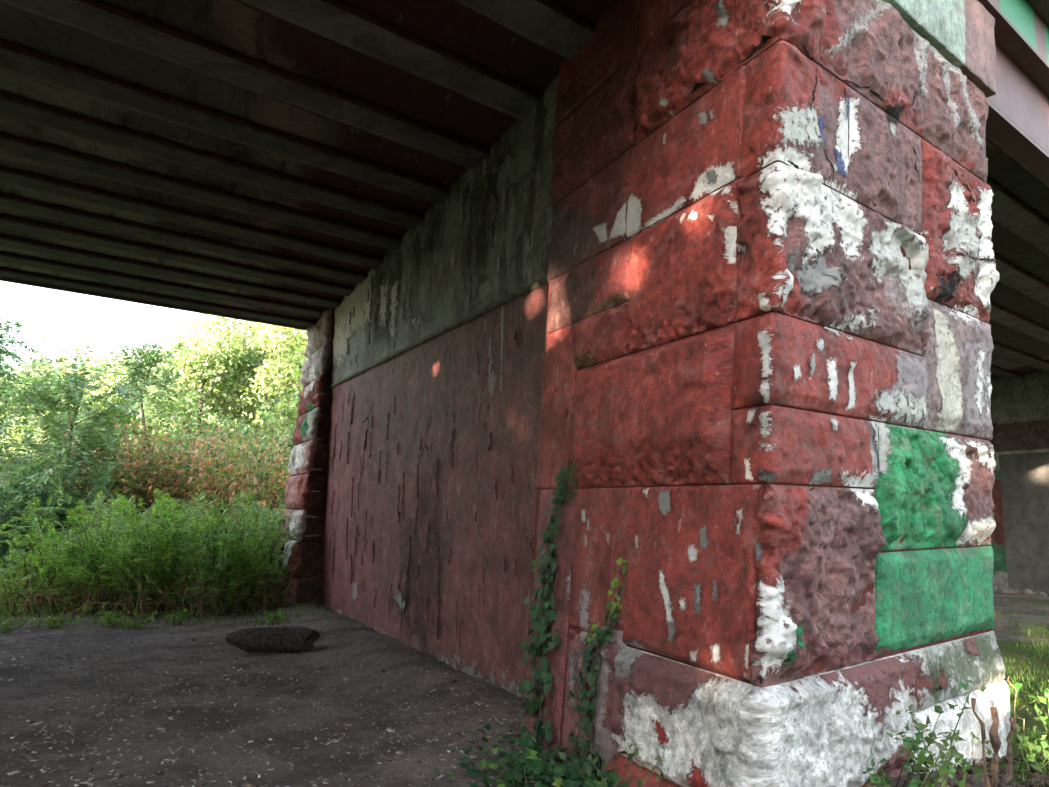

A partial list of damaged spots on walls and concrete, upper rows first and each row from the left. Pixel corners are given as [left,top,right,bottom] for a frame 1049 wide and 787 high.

peeling [764,0,801,25]
peeling [593,159,746,264]
peeling [757,94,1000,550]
peeling [744,327,777,482]
peeling [643,488,671,516]
peeling [600,570,957,749]
peeling [686,758,710,787]